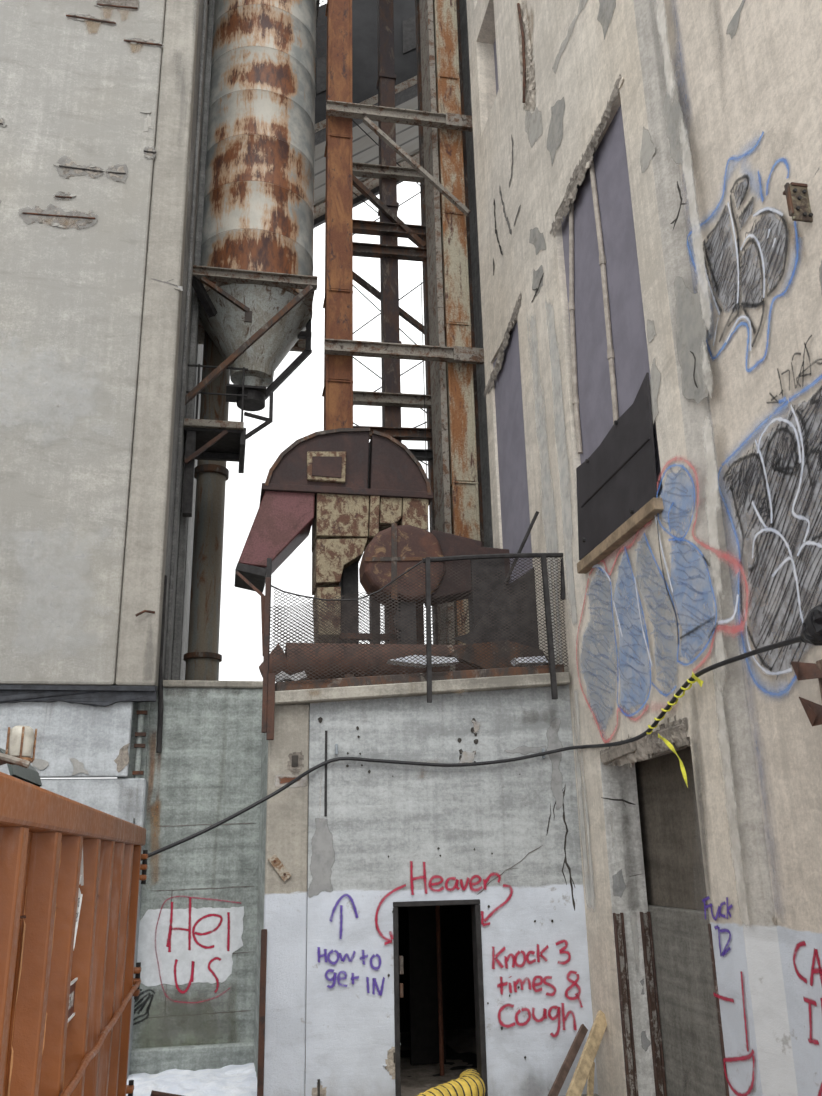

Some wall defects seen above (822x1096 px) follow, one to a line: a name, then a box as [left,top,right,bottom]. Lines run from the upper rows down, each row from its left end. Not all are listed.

spalling [66,0,139,26]
spalling [124,38,163,48]
spalling [53,156,128,183]
spalling [19,191,98,230]
crack [601,797,636,807]
crack [477,784,575,911]